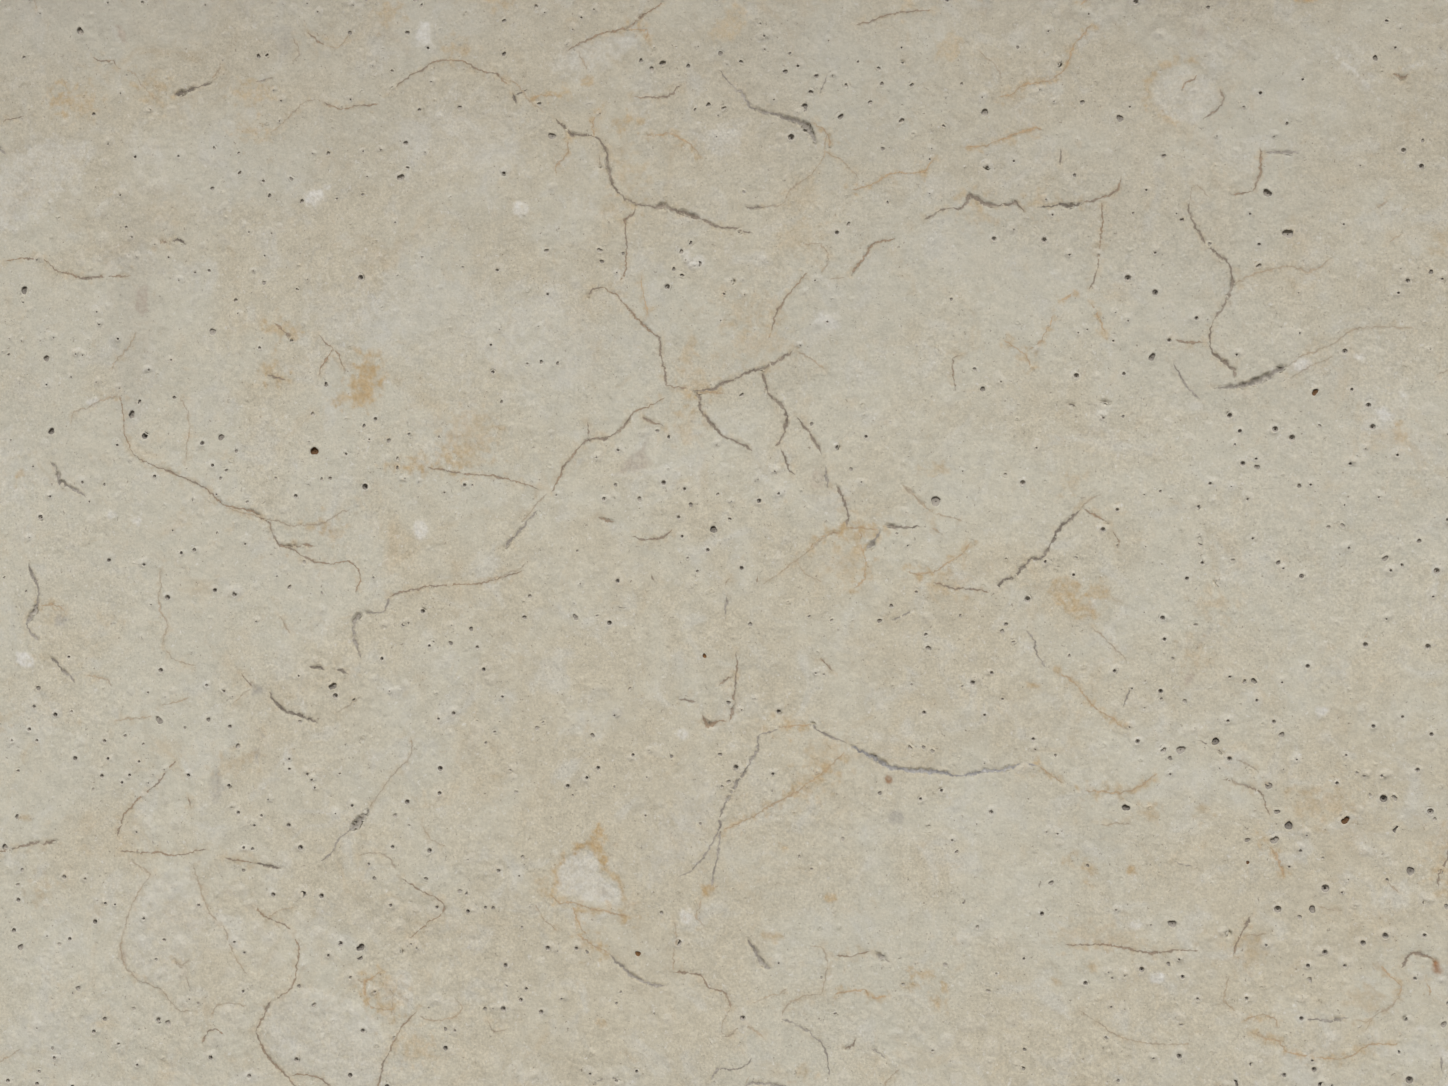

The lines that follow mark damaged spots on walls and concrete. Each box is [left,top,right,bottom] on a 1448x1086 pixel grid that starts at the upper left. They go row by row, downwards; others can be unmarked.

crack [1200,77,1234,123]
crack [1162,136,1420,408]
crack [41,455,95,501]
crack [106,0,1169,1086]